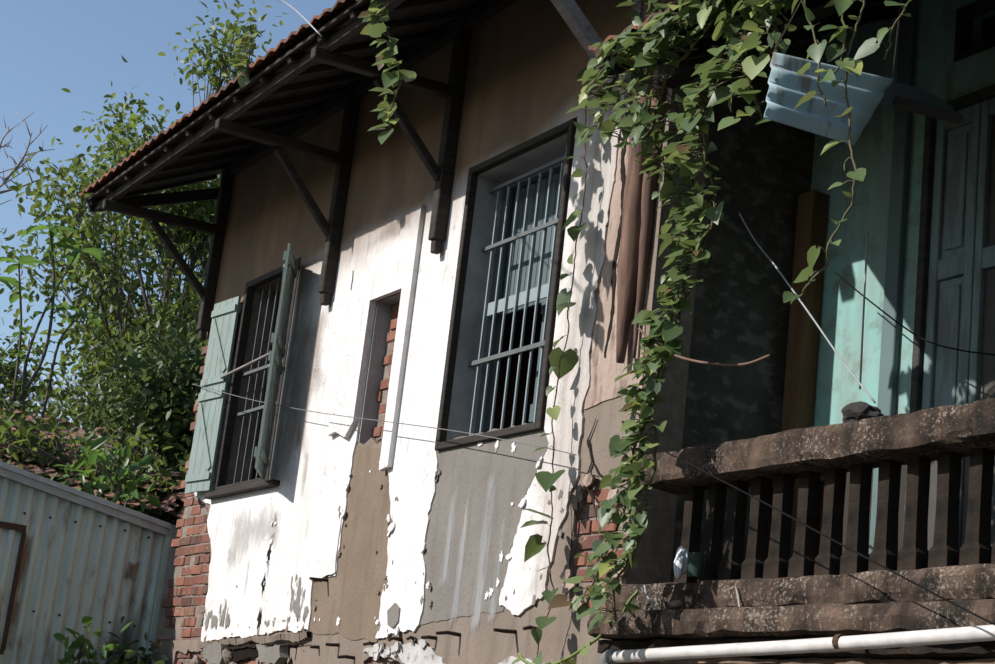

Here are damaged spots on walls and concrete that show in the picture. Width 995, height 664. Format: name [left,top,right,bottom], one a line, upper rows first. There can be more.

spalling [259,539,273,594]
peeling [285,301,446,664]
peeling [415,421,549,626]
flaking render [547,472,627,611]
peeling [499,656,546,664]